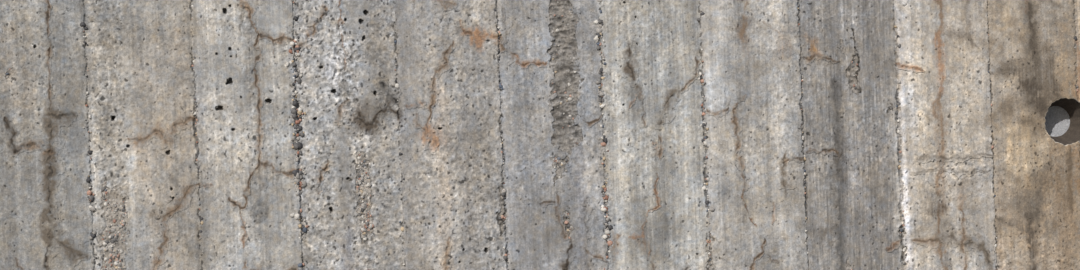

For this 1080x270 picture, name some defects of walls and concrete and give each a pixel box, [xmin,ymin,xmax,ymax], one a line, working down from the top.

crack [125,113,198,157]
crack [145,0,347,270]
crack [333,0,548,152]
crack [439,236,451,270]
crack [580,35,701,270]
crack [706,94,841,270]
crack [803,54,840,65]
damp [940,0,1080,270]